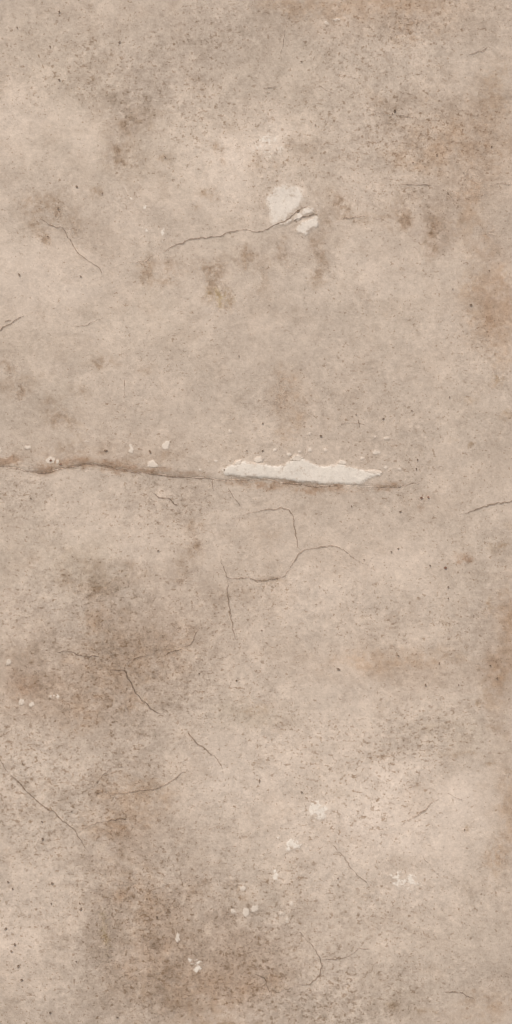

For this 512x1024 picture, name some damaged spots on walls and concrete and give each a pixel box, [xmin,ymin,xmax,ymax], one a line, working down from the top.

crack [168,207,317,249]
peeling [263,180,321,238]
peeling [220,432,402,488]
crack [20,464,348,632]
crack [61,634,196,713]
crack [0,760,181,847]